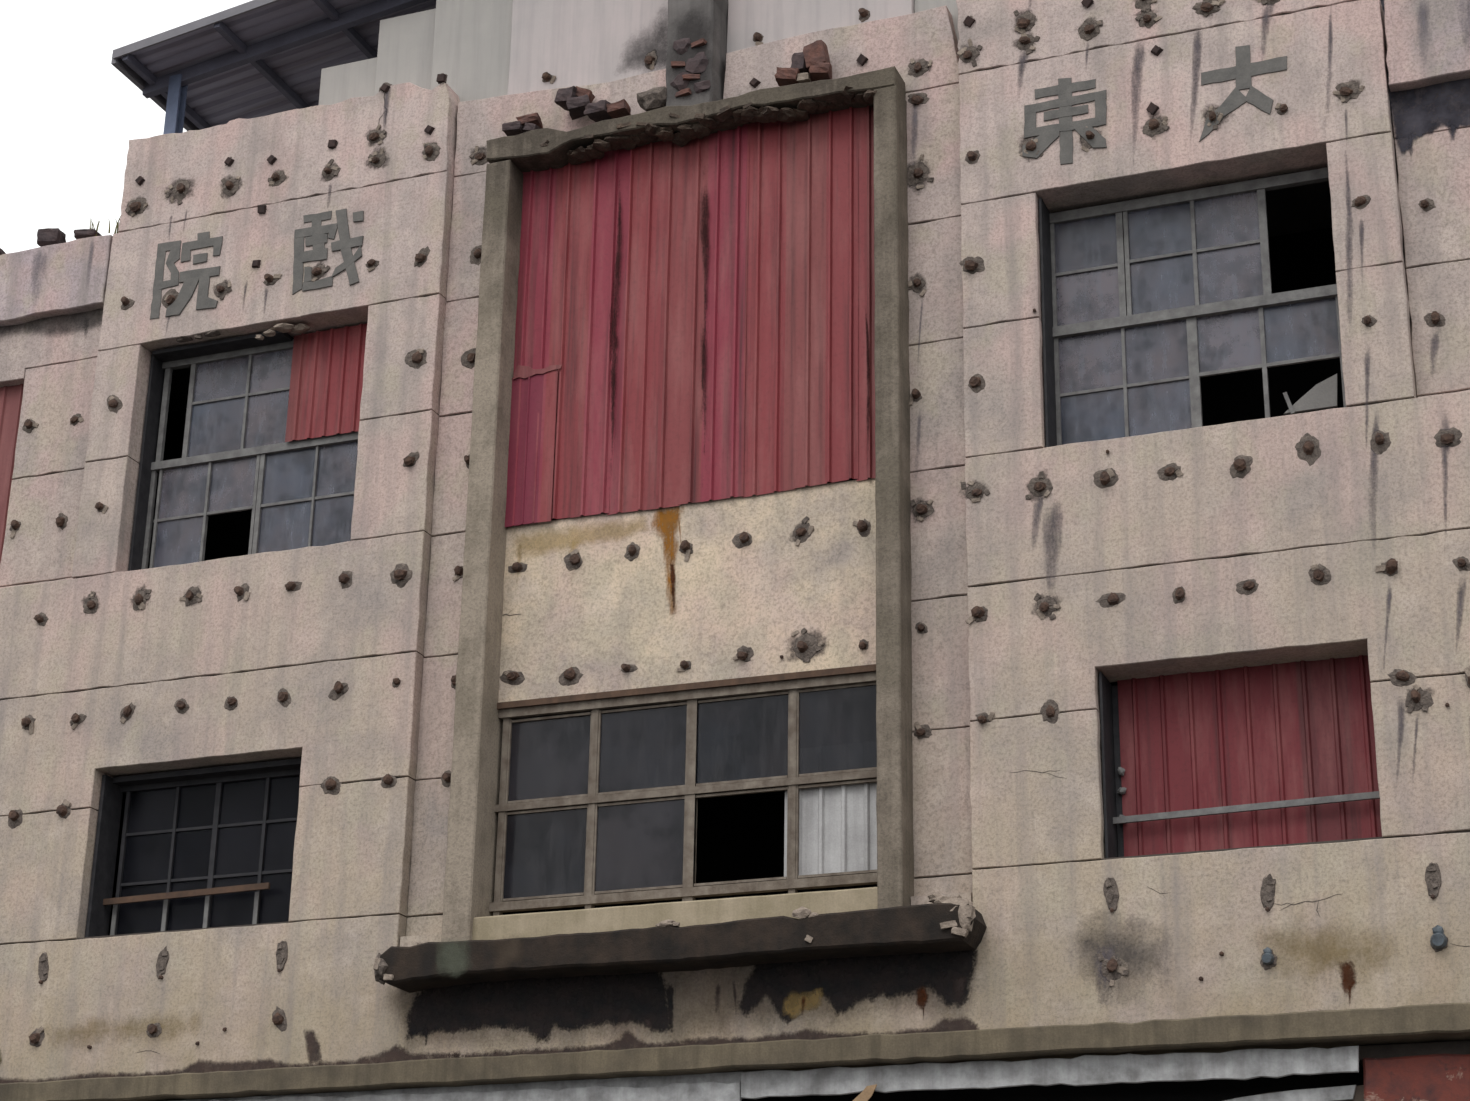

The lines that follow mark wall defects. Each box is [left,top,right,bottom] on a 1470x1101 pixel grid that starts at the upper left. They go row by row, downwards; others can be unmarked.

spalling [566,38,877,165]
leakage [1133,50,1143,115]
leakage [1193,32,1201,106]
corrosion [654,507,680,611]
spalling [928,894,976,937]
leakage [0,950,978,1083]
corrosion [1340,961,1355,1000]